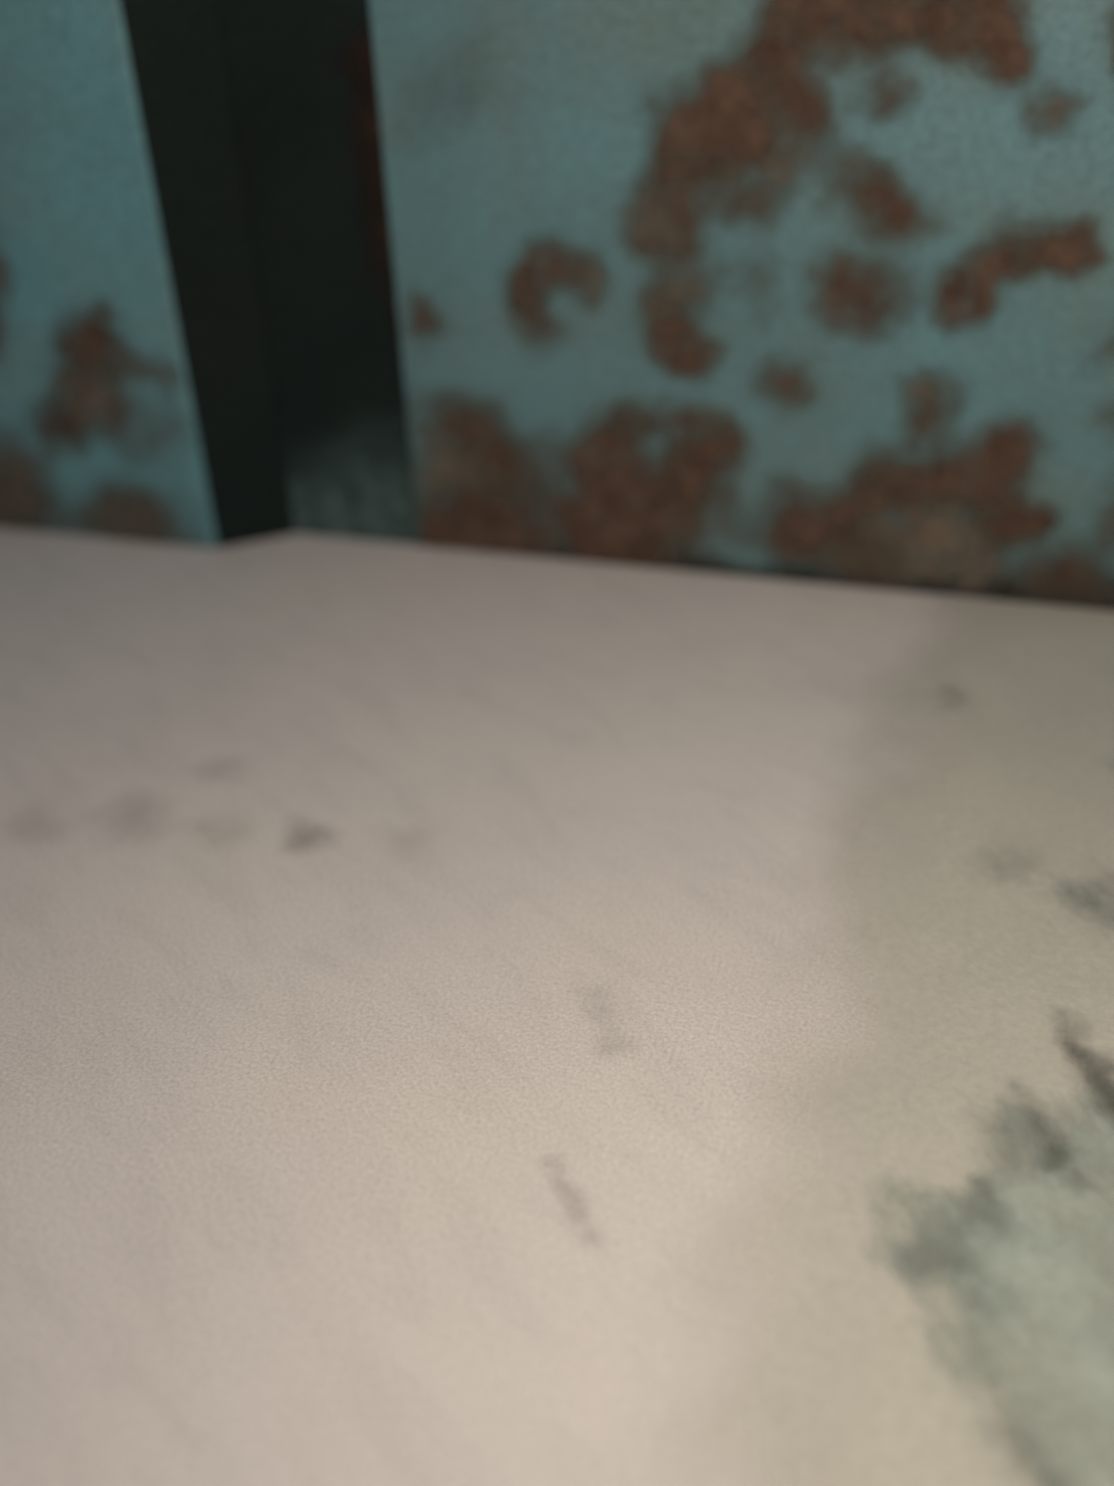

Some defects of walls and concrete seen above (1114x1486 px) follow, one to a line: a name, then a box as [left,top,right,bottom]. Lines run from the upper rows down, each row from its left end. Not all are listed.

rust [351,34,393,263]
rust [631,0,1033,377]
rust [510,242,605,338]
rust [936,222,1104,329]
rust [37,305,171,442]
rust [0,447,47,530]
rust [75,489,192,547]
rust [414,405,1114,610]
water stain [780,600,1114,1486]